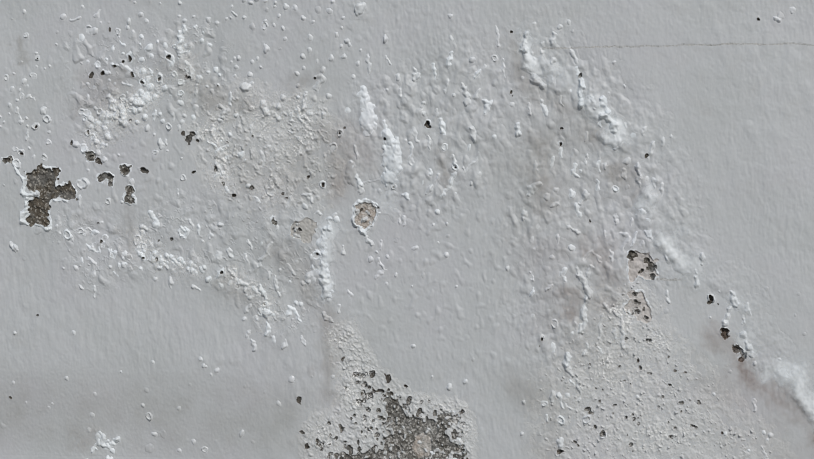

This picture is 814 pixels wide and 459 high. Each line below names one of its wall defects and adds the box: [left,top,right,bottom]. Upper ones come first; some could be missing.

spalling [2,155,78,232]
spalling [96,163,137,206]
spalling [182,73,381,243]
peeling [486,4,800,459]
spalling [297,320,480,459]